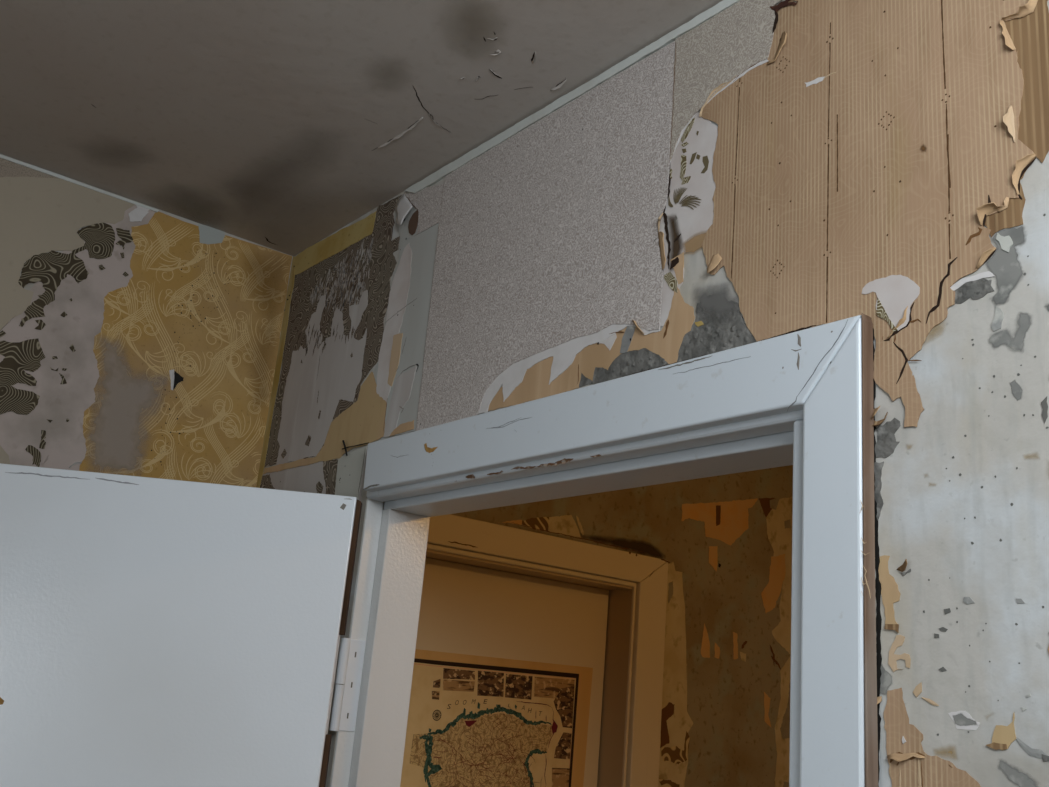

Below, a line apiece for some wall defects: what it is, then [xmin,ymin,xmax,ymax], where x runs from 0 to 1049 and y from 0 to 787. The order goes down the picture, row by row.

crack [372,85,448,151]
crack [1018,158,1036,200]
peeling [116,205,150,258]
peeling [19,290,55,330]
crack [882,195,996,384]
flaking render [950,226,1031,351]
flaking render [579,287,757,387]
flaking render [979,365,1022,400]
flaking render [1023,397,1049,429]
peeling [25,419,53,467]
flaking render [874,418,901,520]
peeling [660,702,675,748]